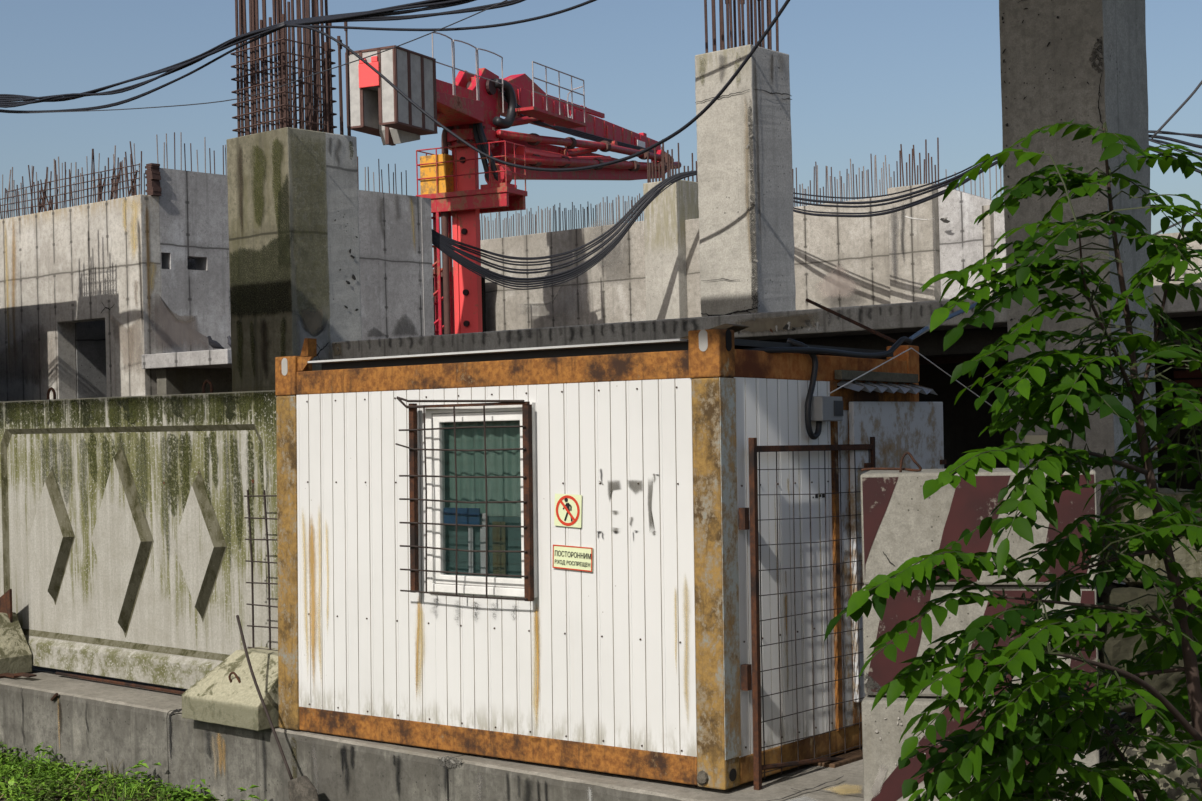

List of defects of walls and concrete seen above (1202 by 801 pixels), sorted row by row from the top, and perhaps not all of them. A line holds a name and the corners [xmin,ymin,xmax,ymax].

damp [239,137,283,227]
damp [236,317,286,377]
damp [0,394,268,560]
corrosion [303,524,328,667]
damp [341,746,354,789]
damp [506,774,547,801]